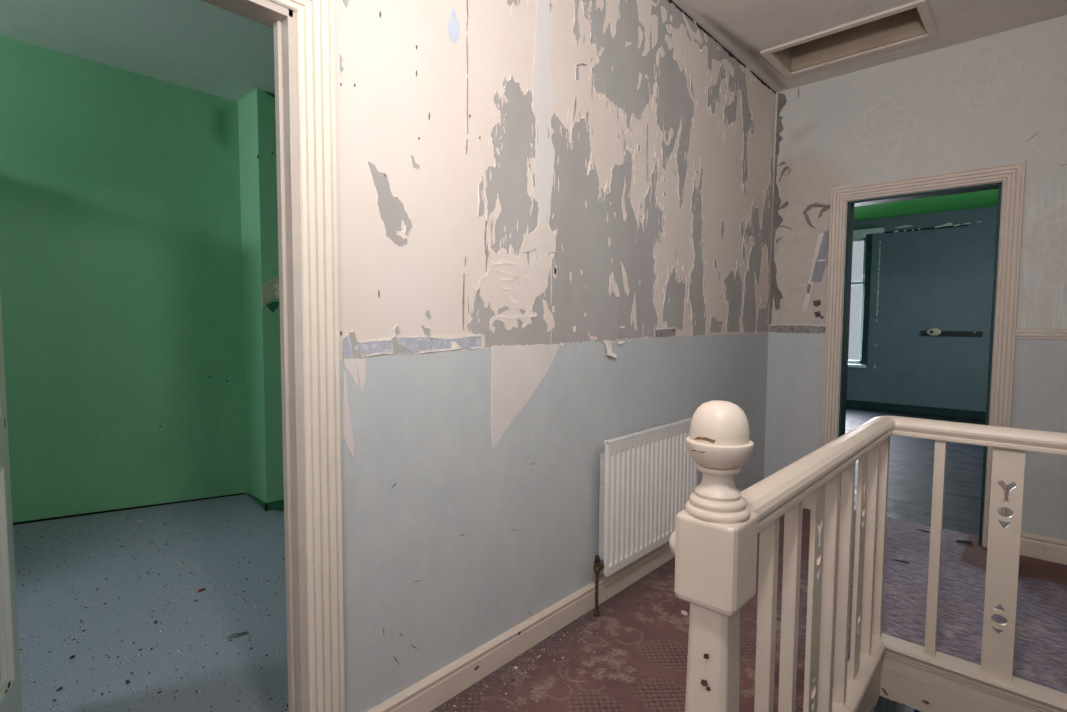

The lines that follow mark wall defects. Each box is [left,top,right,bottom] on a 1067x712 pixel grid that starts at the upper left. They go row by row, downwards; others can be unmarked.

peeling [367,161,413,247]
peeling [466,0,787,348]
peeling [262,277,280,313]
peeling [806,231,829,293]